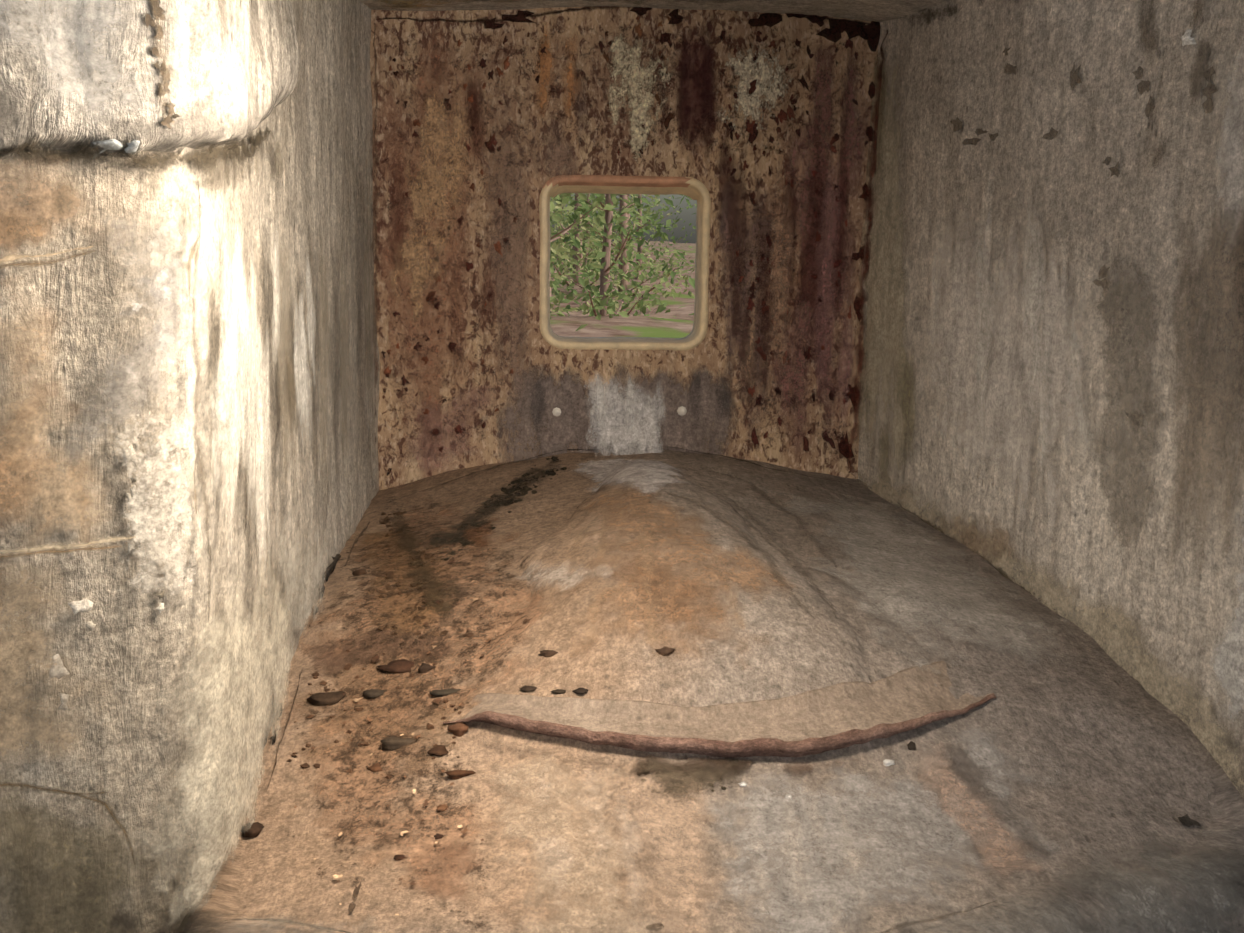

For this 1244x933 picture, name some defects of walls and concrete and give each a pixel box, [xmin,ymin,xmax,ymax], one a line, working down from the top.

rust [372,22,888,473]
water stain [579,382,837,619]
water stain [722,41,1244,789]